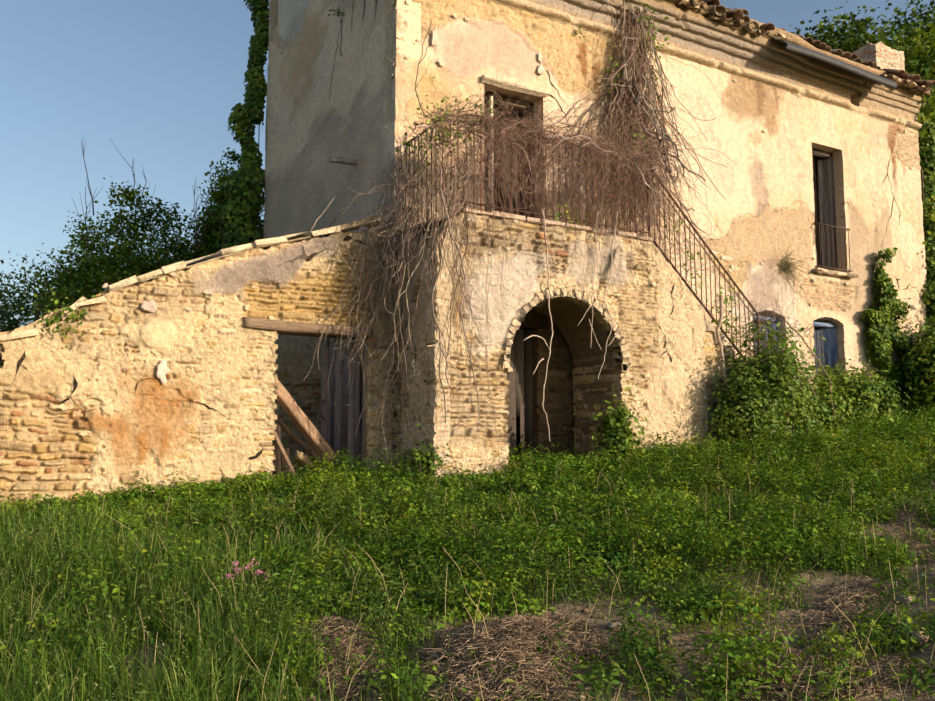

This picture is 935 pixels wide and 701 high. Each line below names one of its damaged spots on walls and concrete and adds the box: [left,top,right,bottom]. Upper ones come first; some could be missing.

spalling [386,0,630,121]
spalling [244,254,372,326]
flaking render [703,206,855,311]
spalling [0,372,94,509]